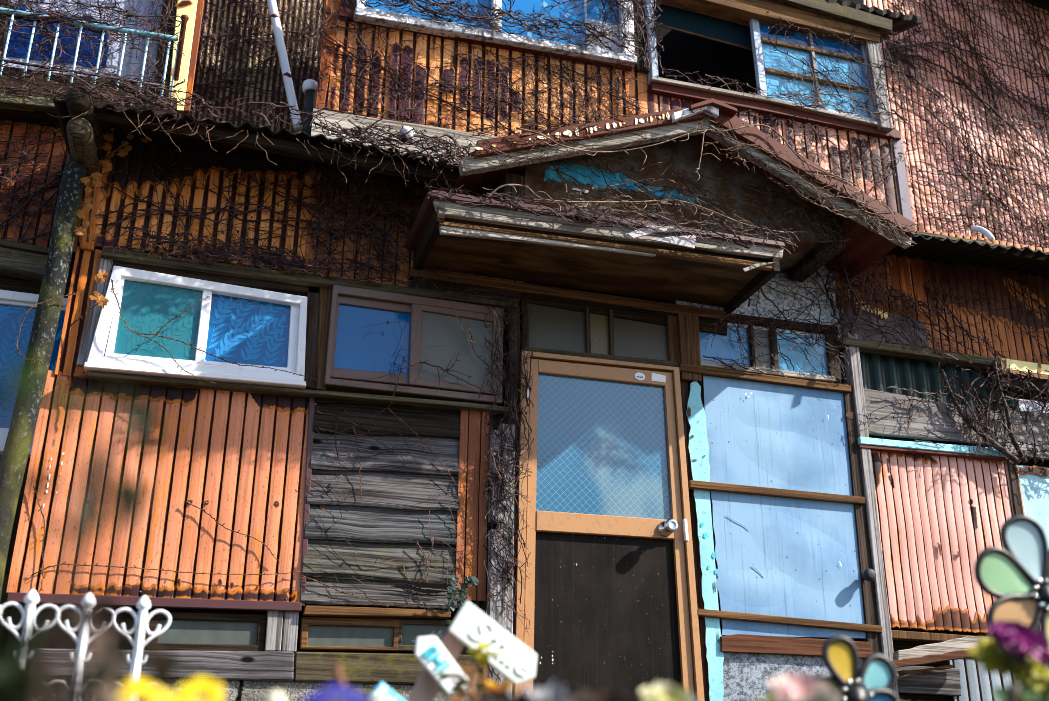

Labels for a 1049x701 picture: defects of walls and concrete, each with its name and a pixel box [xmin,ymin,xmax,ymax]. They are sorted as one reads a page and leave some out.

peeling [529,112,670,140]
rust [56,373,199,444]
rust [250,393,309,414]
rust [69,579,299,602]
rust [890,605,988,633]